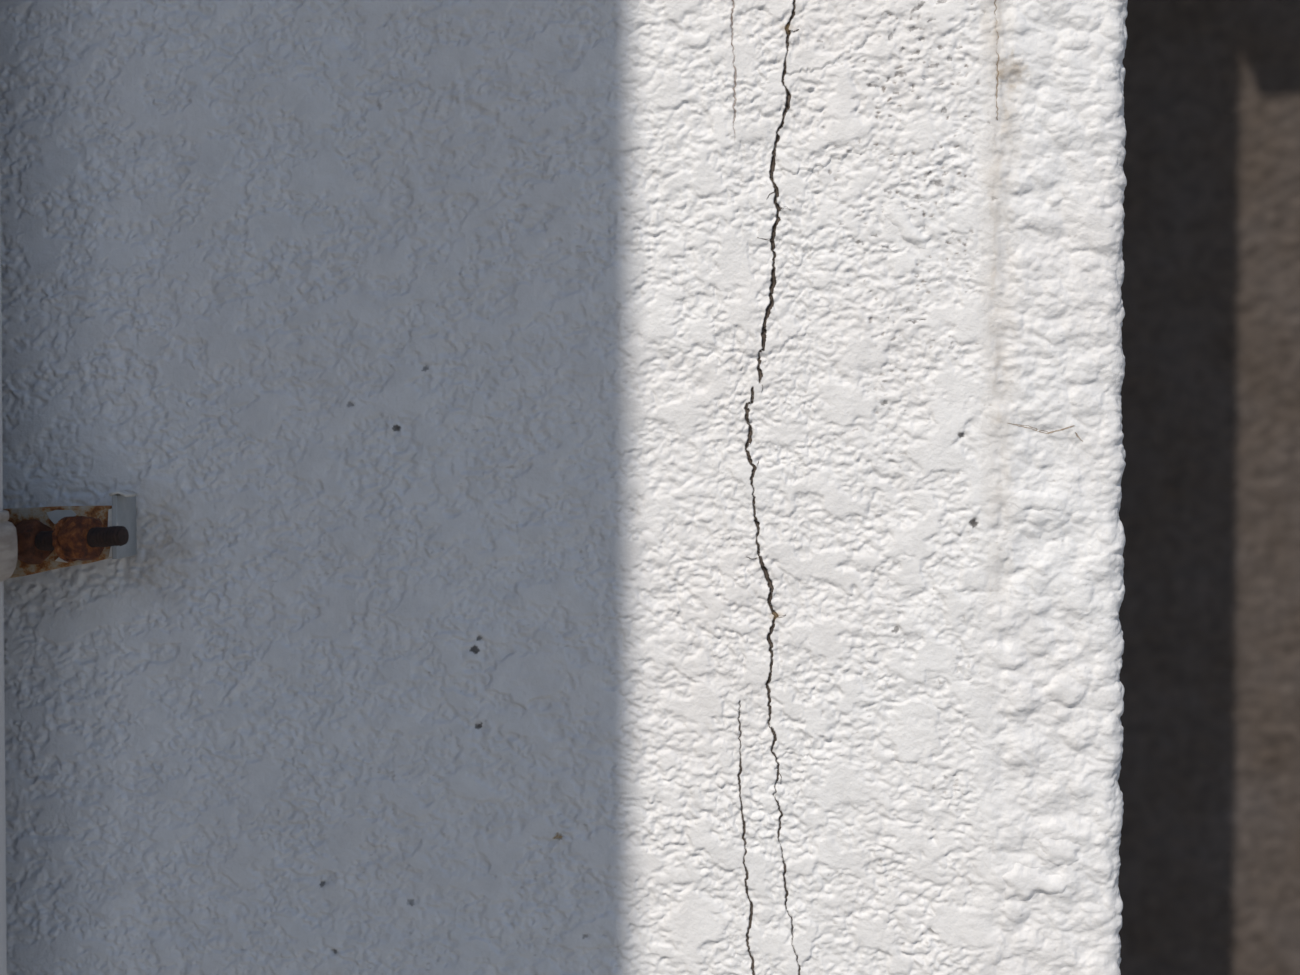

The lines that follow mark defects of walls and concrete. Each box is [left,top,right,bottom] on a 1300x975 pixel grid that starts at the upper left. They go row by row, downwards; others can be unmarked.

crack [729,0,737,141]
crack [738,0,800,975]